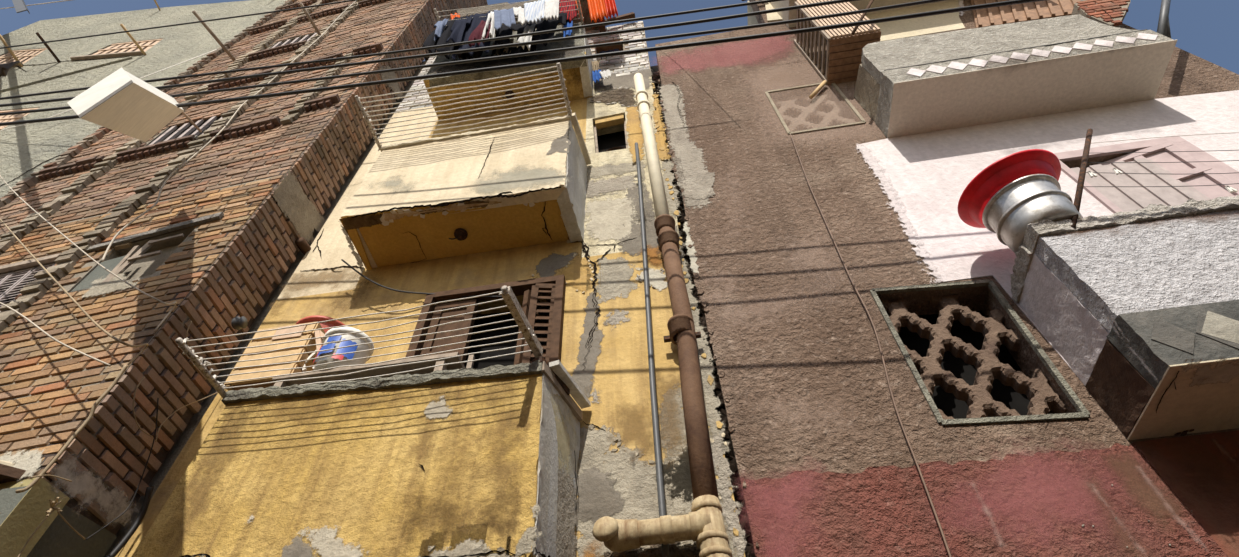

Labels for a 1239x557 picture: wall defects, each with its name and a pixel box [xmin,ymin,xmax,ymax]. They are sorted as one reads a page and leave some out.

spalling [338,197,503,272]
crack [304,142,634,370]
spalling [532,69,747,557]
peeling [1182,358,1239,387]
spalling [419,383,700,557]
crack [180,549,211,557]
spalling [296,525,369,557]
crack [422,547,550,557]